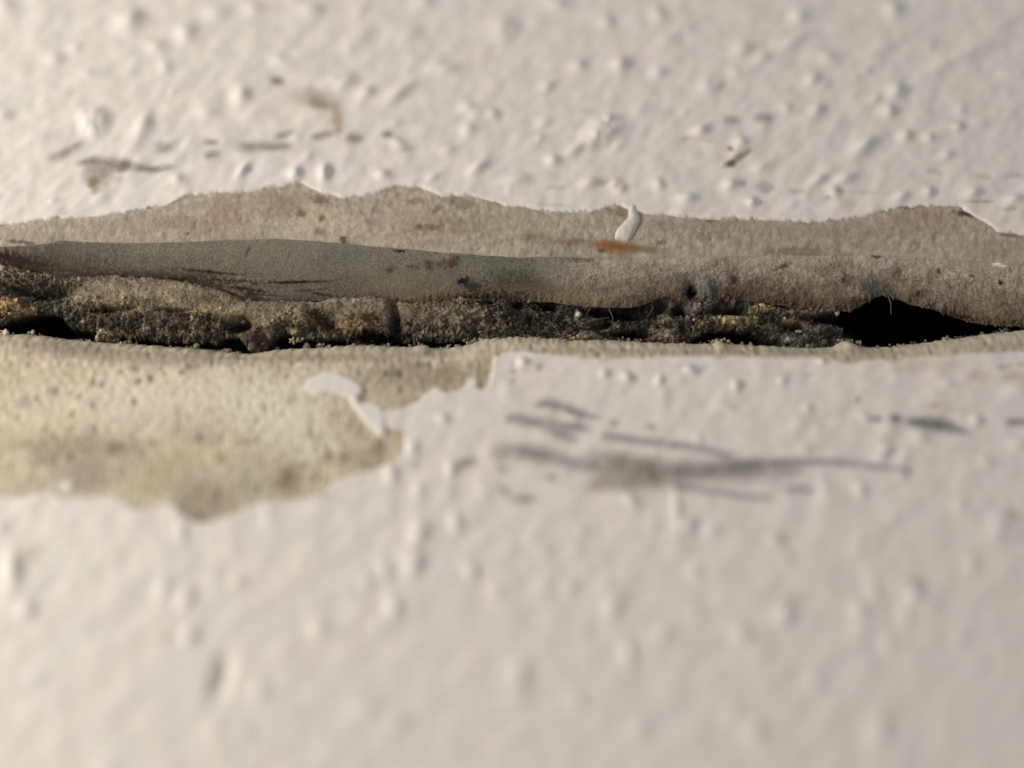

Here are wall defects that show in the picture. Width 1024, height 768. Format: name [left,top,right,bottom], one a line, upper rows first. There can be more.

flaking render [0,183,1024,266]
crack [0,239,1024,354]
corrosion [598,242,628,252]
flaking render [0,330,1024,523]